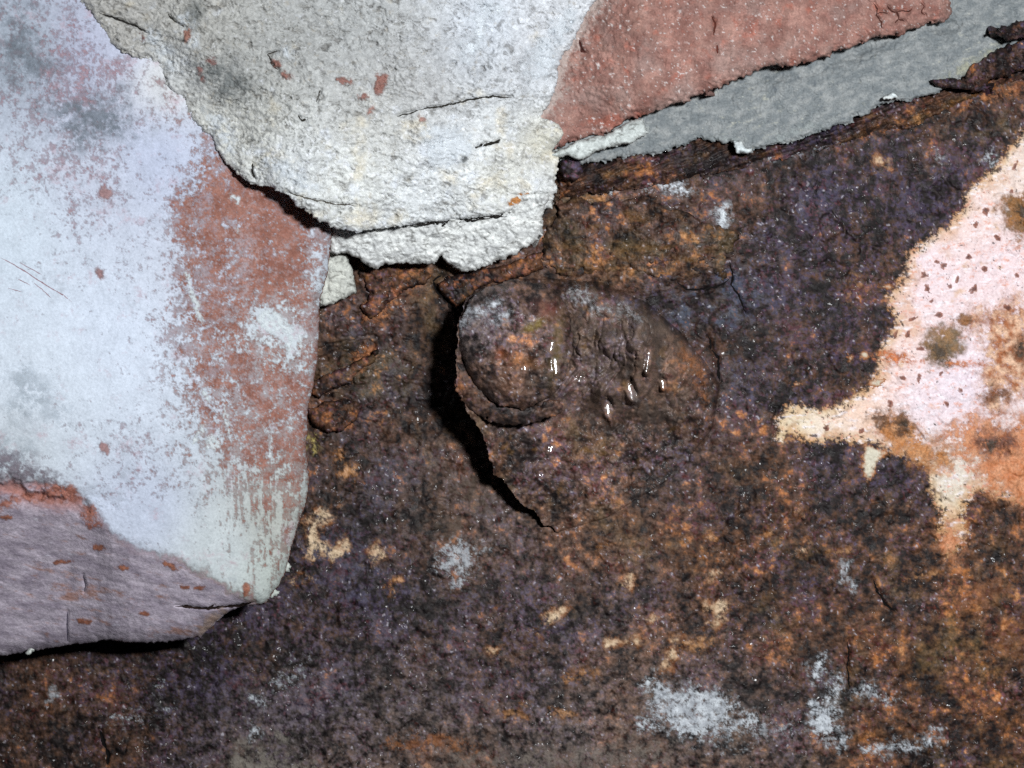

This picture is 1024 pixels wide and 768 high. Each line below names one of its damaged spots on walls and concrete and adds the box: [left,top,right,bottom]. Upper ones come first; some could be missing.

spalling [358,74,388,114]
crack [399,95,511,116]
rust [960,82,1023,112]
rust [994,193,1024,242]
peeling [0,0,333,604]
crack [433,275,459,315]
rust [358,252,543,323]
peeling [774,127,1024,562]
rust [307,345,380,453]
rust [872,295,1024,507]